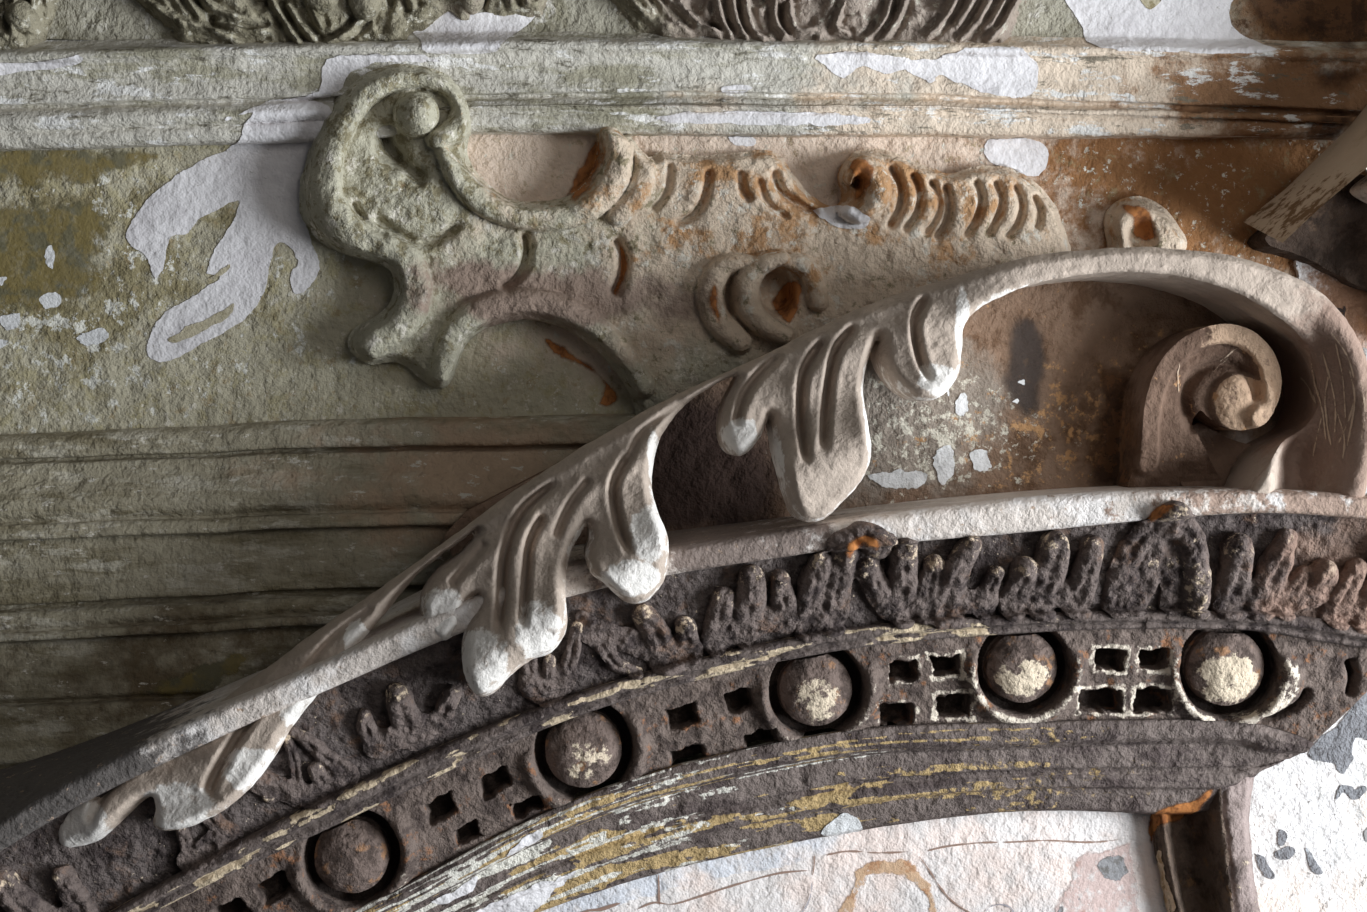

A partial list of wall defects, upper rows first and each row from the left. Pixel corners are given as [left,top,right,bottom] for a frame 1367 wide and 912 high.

flaking render [1065,0,1277,54]
flaking render [815,46,1039,98]
flaking render [656,110,871,146]
flaking render [126,12,535,362]
rust [570,142,603,199]
rust [1122,205,1155,240]
rust [614,245,627,294]
rust [545,339,617,406]
flaking render [1308,692,1367,800]
flaking render [1256,829,1323,879]
flaking render [476,871,576,912]
peeling [839,859,936,912]